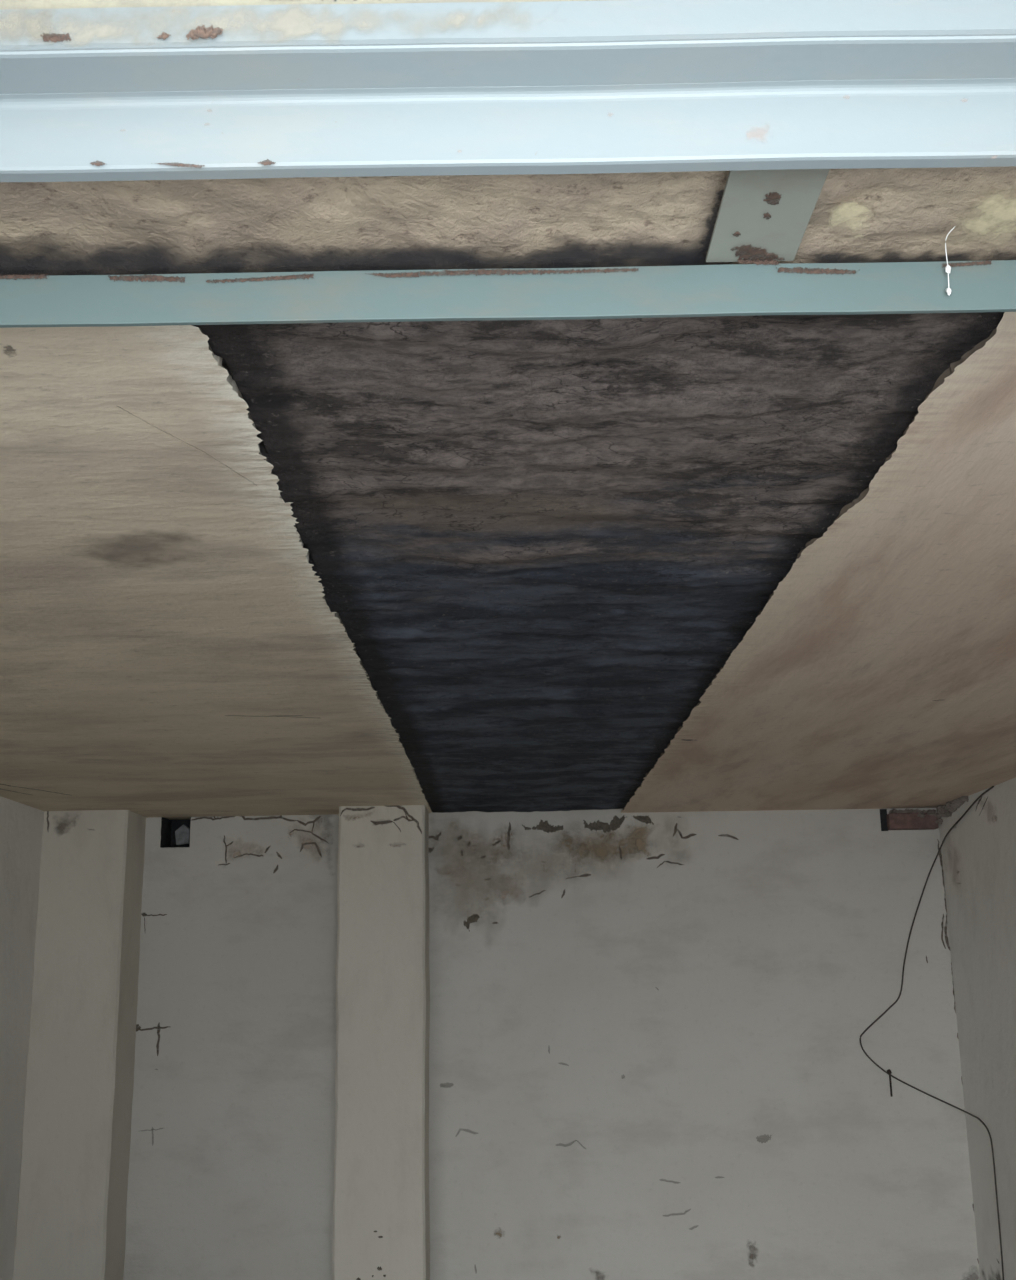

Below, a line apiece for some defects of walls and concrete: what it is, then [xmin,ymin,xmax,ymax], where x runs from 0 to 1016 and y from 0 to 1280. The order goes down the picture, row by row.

corrosion [763,192,782,219]
damp [0,190,732,275]
corrosion [731,231,856,275]
corrosion [108,274,185,282]
corrosion [206,274,314,283]
corrosion [365,268,638,278]
flaking render [522,820,563,833]
flaking render [583,815,654,833]
crack [192,815,326,873]